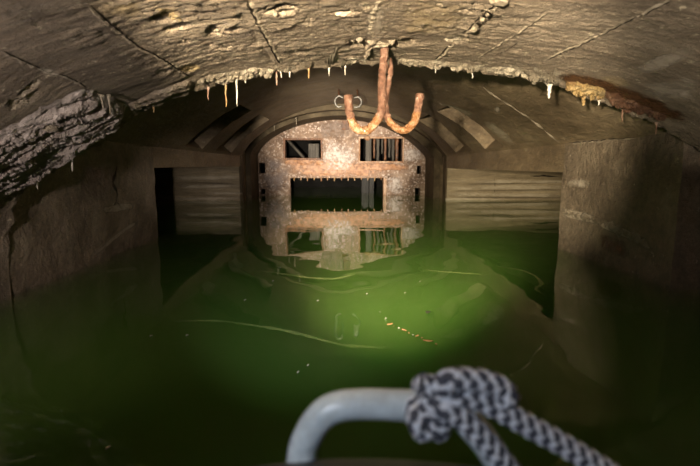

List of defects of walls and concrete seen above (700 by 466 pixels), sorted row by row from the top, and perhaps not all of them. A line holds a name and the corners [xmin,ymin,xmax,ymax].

crack [0,51,85,88]
spalling [0,64,200,200]
crack [87,5,189,77]
damp [191,65,296,85]
crack [246,0,282,64]
damp [324,46,366,69]
damp [396,58,667,121]
crack [484,88,634,144]
crack [544,0,671,61]
rust [562,75,679,119]
rust [285,160,406,176]